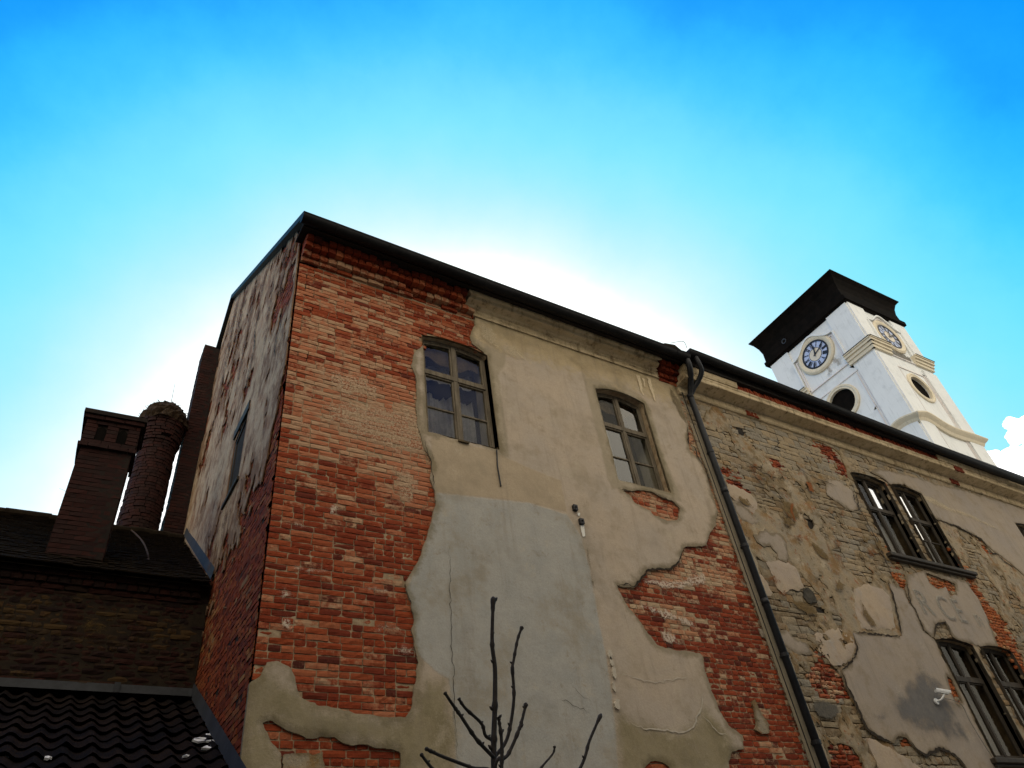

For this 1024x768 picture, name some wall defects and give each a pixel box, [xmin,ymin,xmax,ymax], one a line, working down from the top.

flaking render [183,231,483,768]
flaking render [812,441,860,512]
flaking render [618,396,824,768]
flaking render [854,584,895,630]
flaking render [926,548,1024,672]
flaking render [780,628,856,703]
flaking render [827,738,920,768]